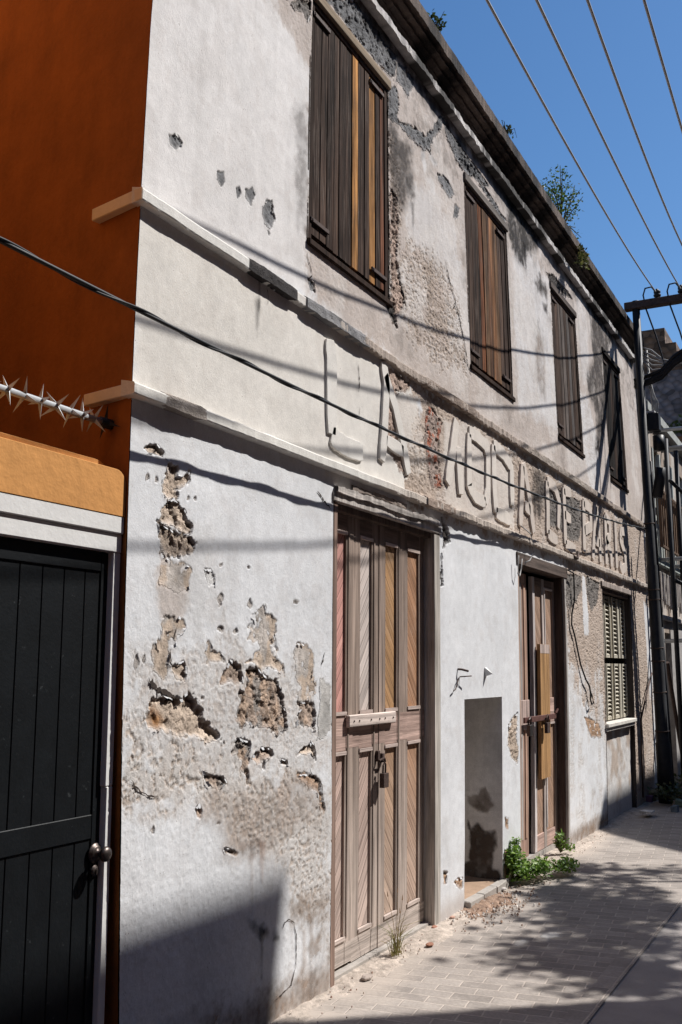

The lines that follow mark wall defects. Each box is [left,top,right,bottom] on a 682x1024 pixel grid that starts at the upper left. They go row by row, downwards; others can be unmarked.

spalling [168,132,183,149]
flaking render [326,0,507,223]
spalling [236,187,274,234]
spalling [386,190,404,327]
spalling [388,370,480,440]
spalling [144,444,223,606]
spalling [390,452,405,474]
spalling [520,442,603,541]
spalling [134,616,216,743]
spalling [202,599,324,811]
spalling [508,714,519,763]
peeling [585,718,602,737]